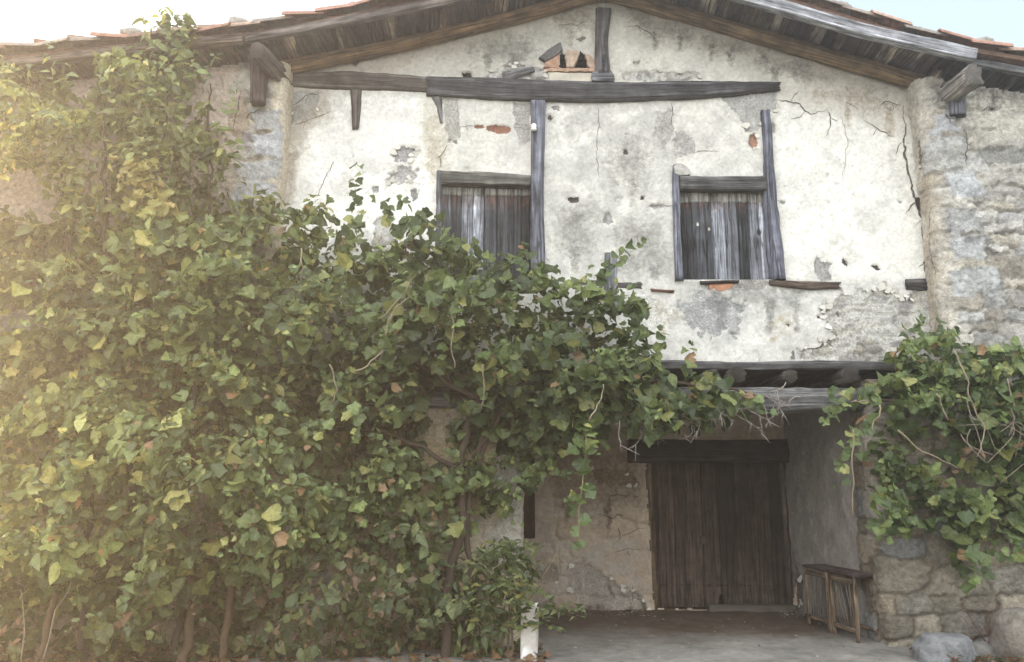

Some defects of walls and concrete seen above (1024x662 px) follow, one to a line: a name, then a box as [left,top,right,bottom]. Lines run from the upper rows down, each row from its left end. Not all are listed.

flaking render [371,144,420,201]
crack [779,91,938,296]
flaking render [814,257,847,281]
peeling [862,265,914,301]
peeling [817,292,848,346]
crack [597,489,644,556]